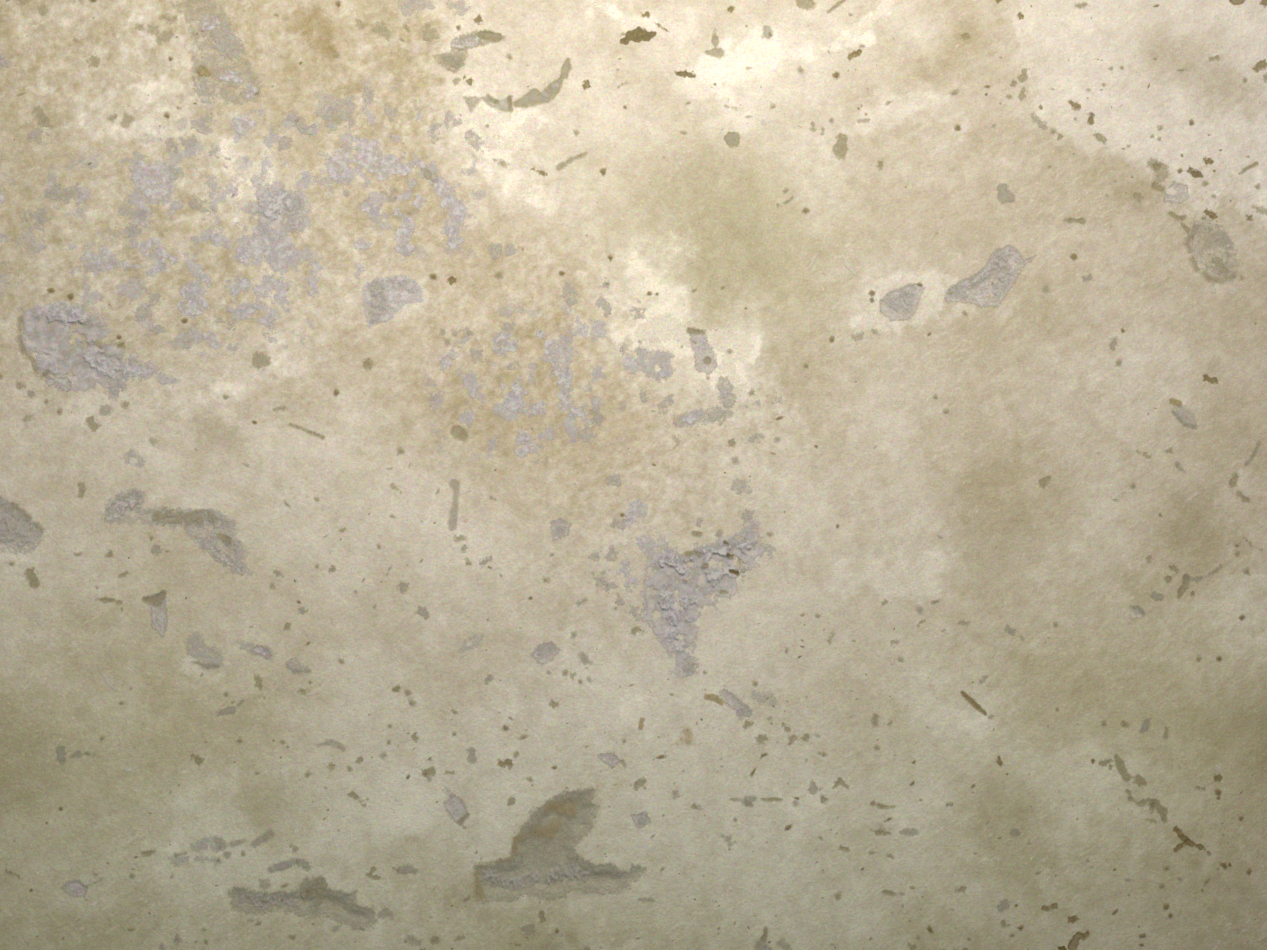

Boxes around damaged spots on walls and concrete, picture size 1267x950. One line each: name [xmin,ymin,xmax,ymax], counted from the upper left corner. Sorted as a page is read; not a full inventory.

spalling [489,59,570,107]
spalling [19,15,481,399]
spalling [869,283,923,321]
spalling [945,245,1033,314]
peeling [439,271,612,458]
spalling [104,488,247,574]
spalling [589,472,776,678]
spalling [229,847,376,929]